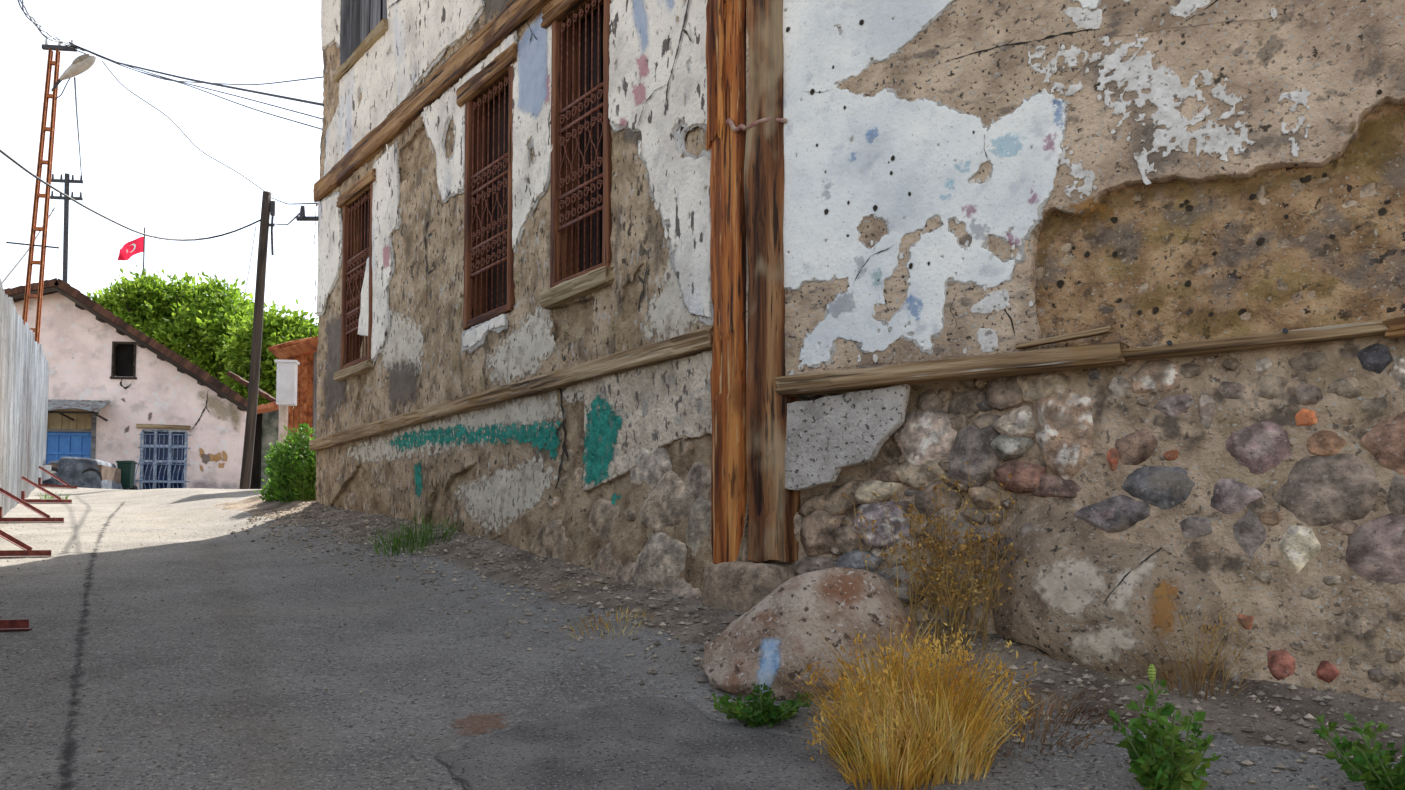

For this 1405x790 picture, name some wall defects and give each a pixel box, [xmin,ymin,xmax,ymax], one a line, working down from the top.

crack [937,27,1107,65]
spalling [386,106,465,197]
peeling [513,181,544,249]
spalling [825,0,1405,369]
peeling [356,257,424,407]
peeling [625,252,708,342]
peeling [785,275,849,376]